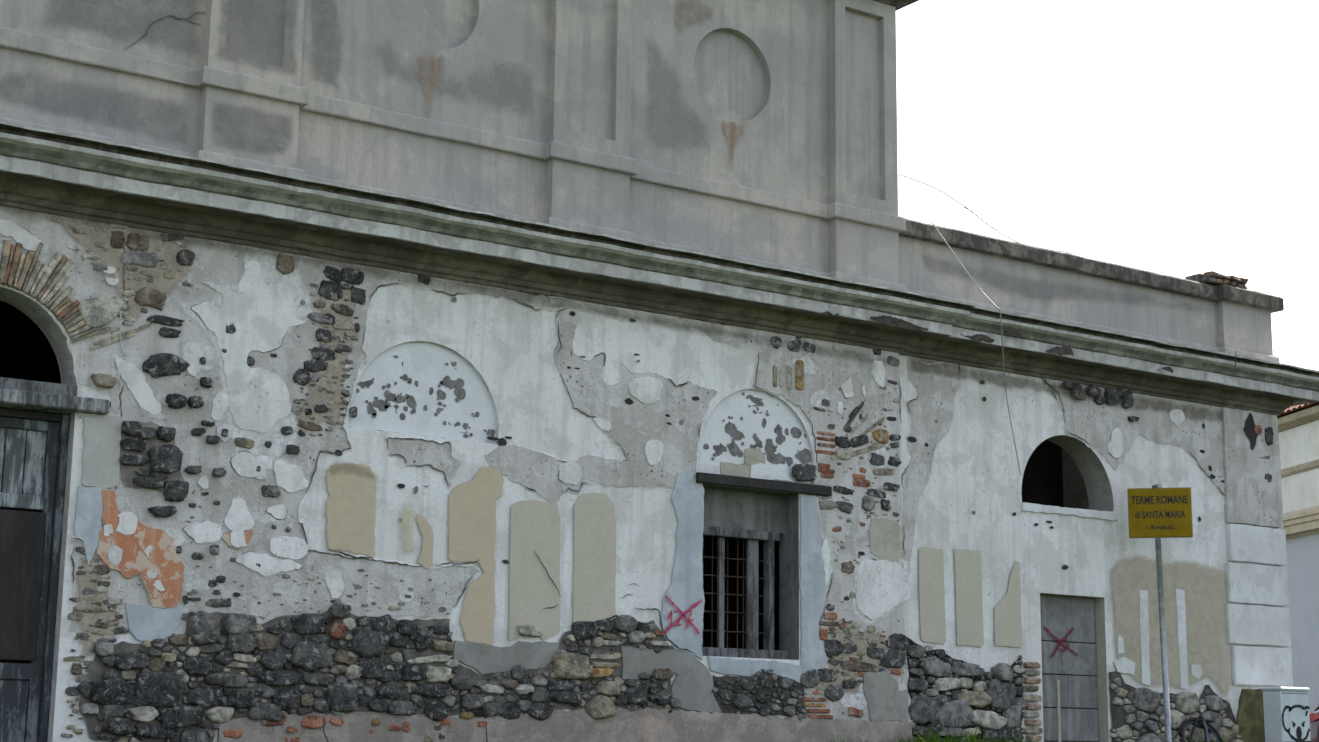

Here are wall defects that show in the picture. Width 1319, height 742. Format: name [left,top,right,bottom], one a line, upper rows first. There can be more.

crack [124,11,207,49]
flaking render [0,205,962,738]
flaking render [1043,378,1258,502]